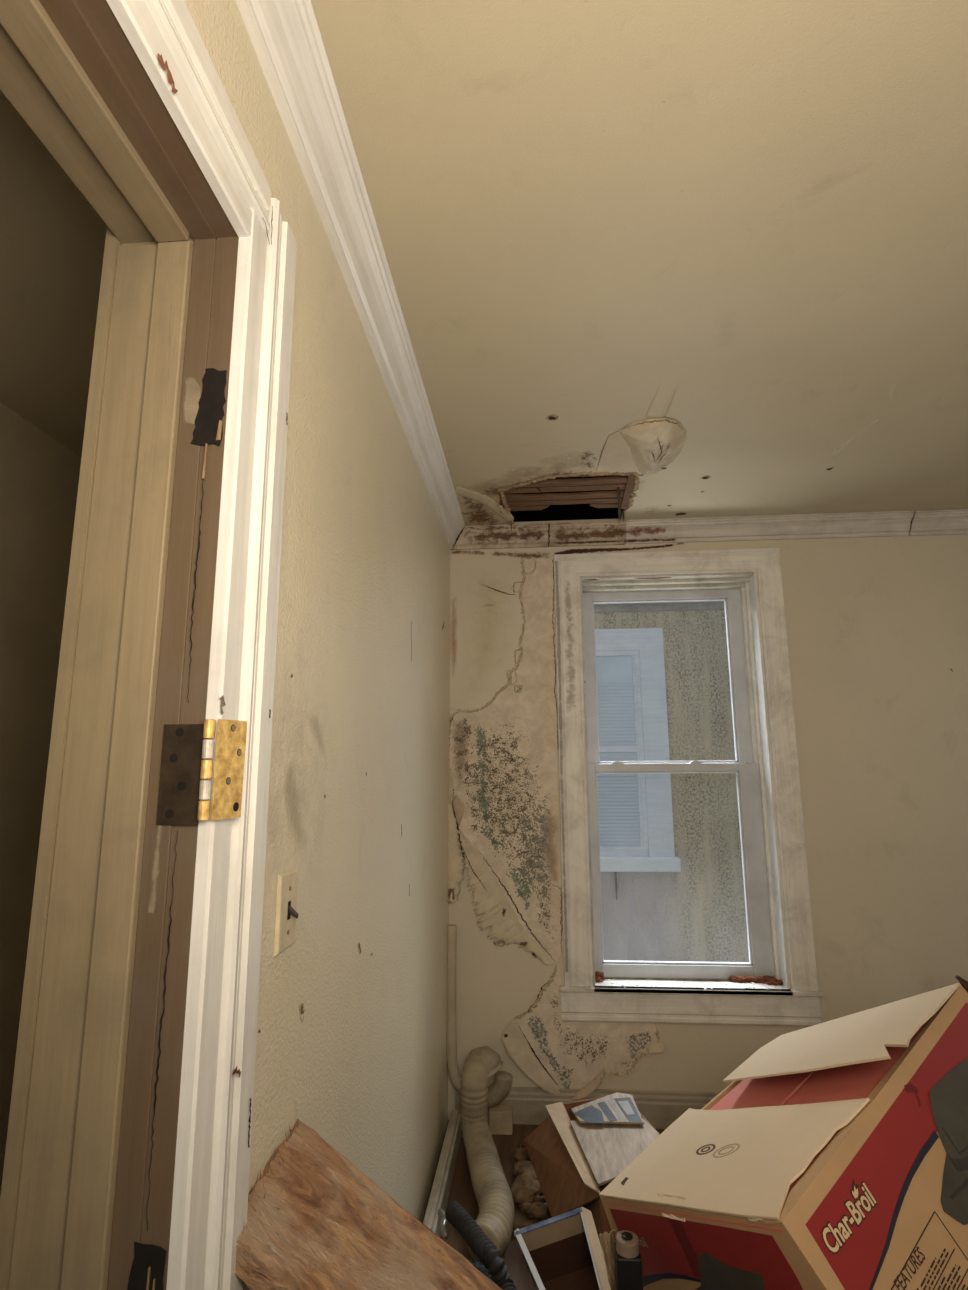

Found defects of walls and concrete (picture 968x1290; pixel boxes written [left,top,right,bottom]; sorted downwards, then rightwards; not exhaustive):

water stain [452,453,627,559]
water stain [452,717,556,939]
flaking render [448,556,660,1100]